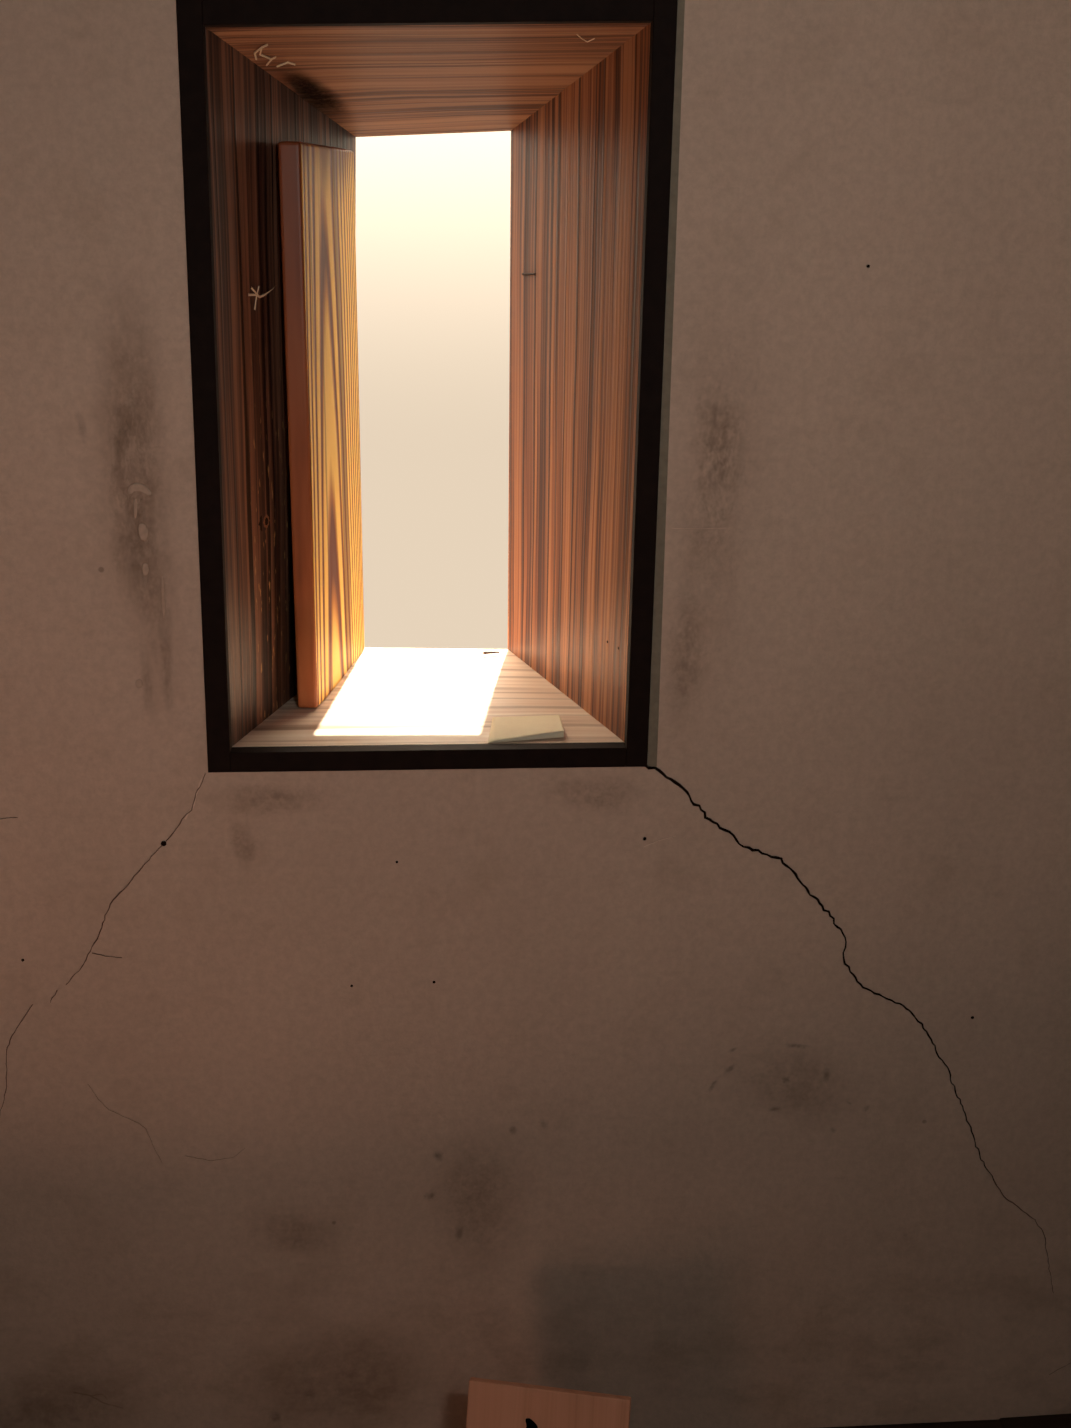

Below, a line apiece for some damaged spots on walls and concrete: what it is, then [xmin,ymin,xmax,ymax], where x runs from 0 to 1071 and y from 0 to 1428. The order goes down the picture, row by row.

crack [0,773,206,1111]
crack [646,766,1054,1293]